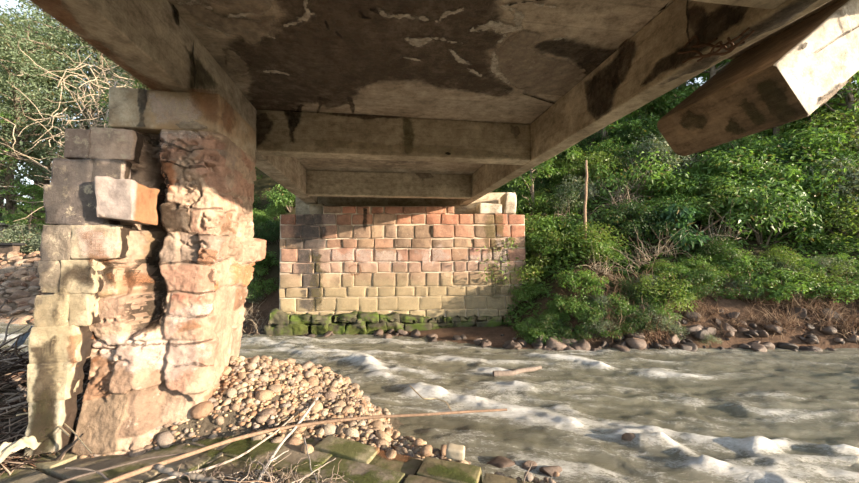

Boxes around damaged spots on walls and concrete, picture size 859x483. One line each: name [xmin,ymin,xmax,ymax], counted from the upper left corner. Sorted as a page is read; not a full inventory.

water stain [196,0,525,153]
water stain [535,37,635,120]